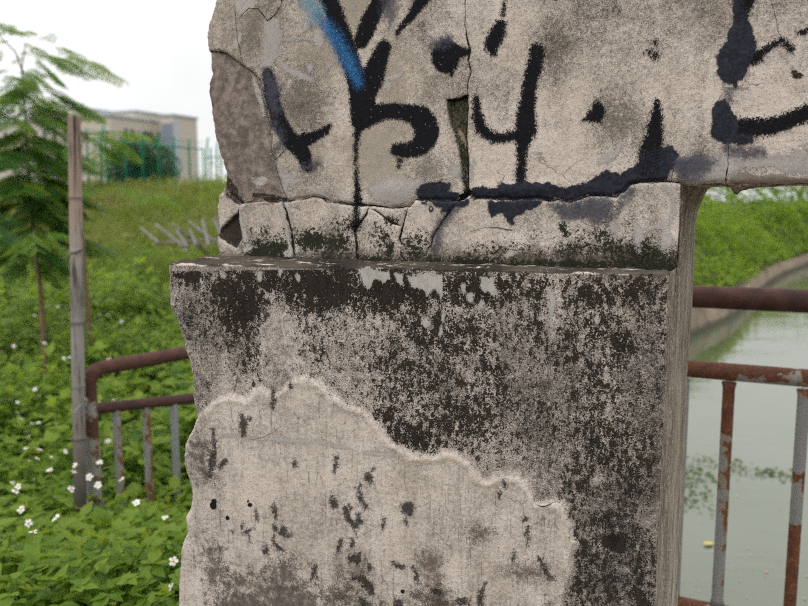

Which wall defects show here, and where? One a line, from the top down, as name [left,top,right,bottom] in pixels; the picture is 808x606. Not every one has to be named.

crack [211,0,282,123]
crack [462,0,472,95]
spalling [209,31,354,248]
crack [227,148,471,261]
crack [542,170,681,227]
peeling [237,411,253,437]
damp [171,266,669,606]
peeling [225,500,260,542]
peeling [260,502,295,555]
peeling [328,467,375,606]
peeling [398,501,416,526]
peeling [452,582,487,606]